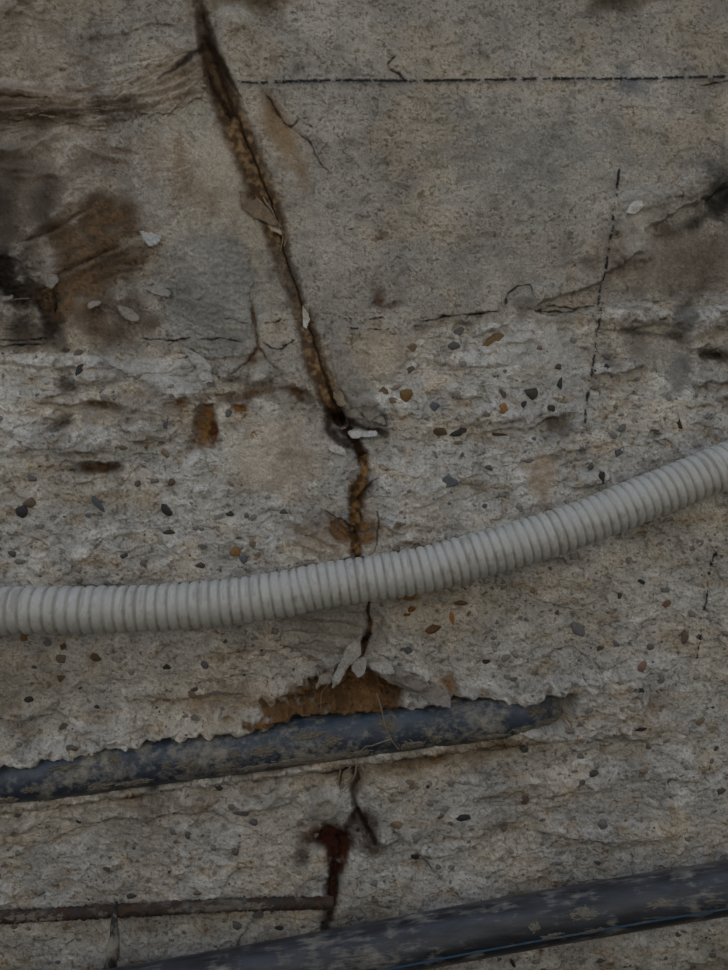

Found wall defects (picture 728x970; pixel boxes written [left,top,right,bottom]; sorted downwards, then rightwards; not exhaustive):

peeling [0,41,208,131]
crack [0,337,43,347]
spalling [0,231,313,485]
rust [226,388,273,411]
crack [142,4,389,558]
rust [288,386,307,401]
spalling [326,185,728,466]
crack [358,601,372,658]
spalling [0,712,254,770]
rust [0,811,380,925]